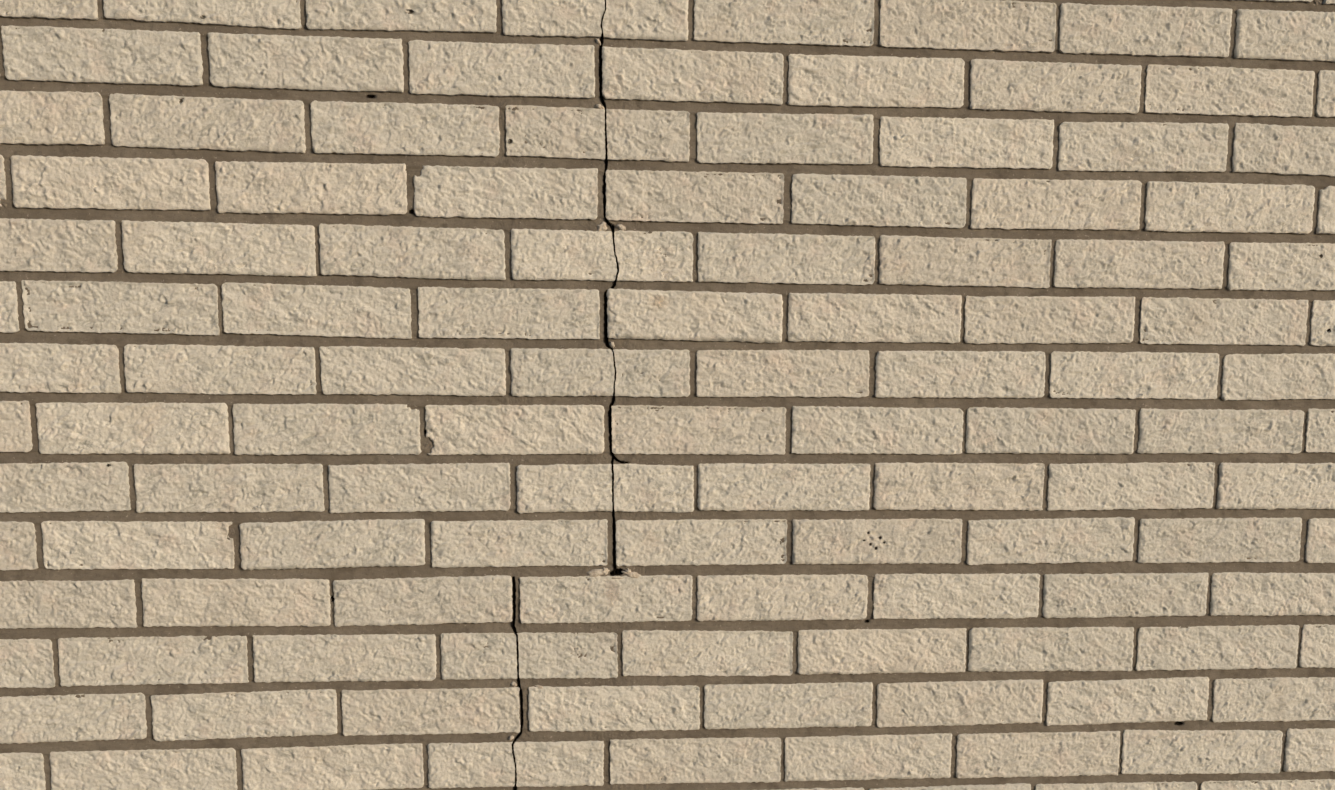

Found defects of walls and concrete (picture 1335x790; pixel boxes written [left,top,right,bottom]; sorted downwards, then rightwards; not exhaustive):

crack [594,0,628,576]
crack [509,577,543,790]